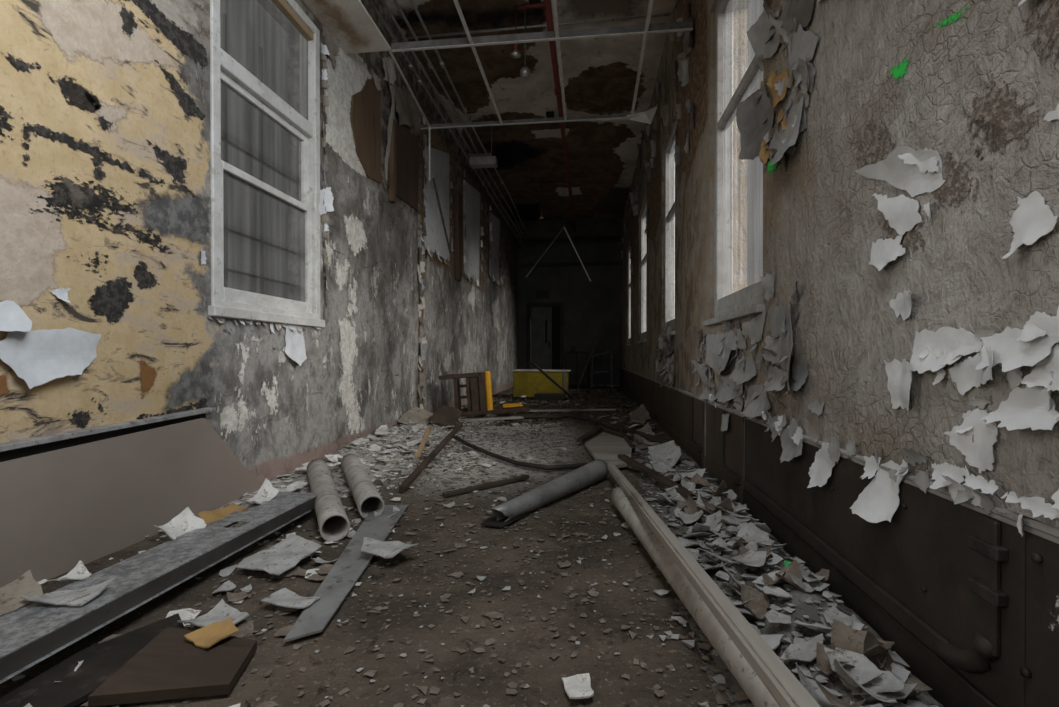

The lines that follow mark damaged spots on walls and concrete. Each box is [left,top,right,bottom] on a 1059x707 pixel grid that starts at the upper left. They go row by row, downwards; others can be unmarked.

peeling [0,105,23,145]
peeling [1,52,127,132]
flaking render [0,171,169,389]
flaking render [38,0,208,120]
peeling [146,139,198,198]
flaking render [207,23,473,486]
flaking render [417,150,503,409]
peeling [404,0,708,288]
peeling [736,0,821,173]
peeling [849,80,1059,271]
peeling [67,398,107,428]
peeling [136,398,208,419]